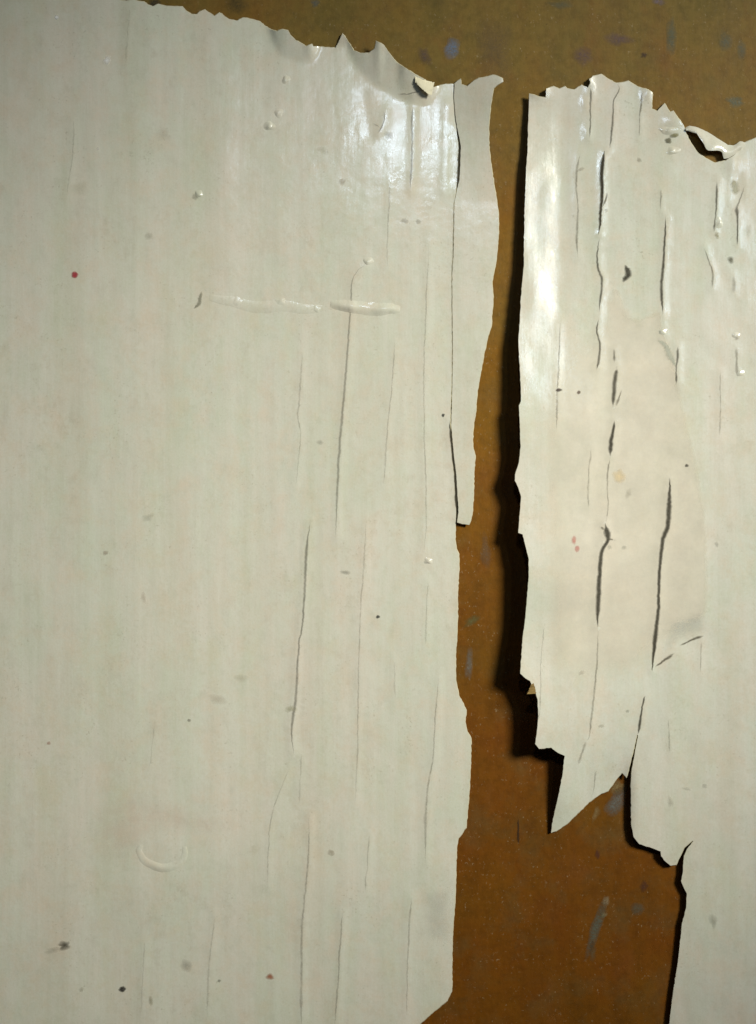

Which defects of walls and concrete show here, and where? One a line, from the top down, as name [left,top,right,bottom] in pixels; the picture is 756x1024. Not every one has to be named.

peeling [139,0,756,162]
crack [590,98,617,453]
peeling [421,75,693,1024]
crack [596,527,612,624]
crack [652,482,700,668]